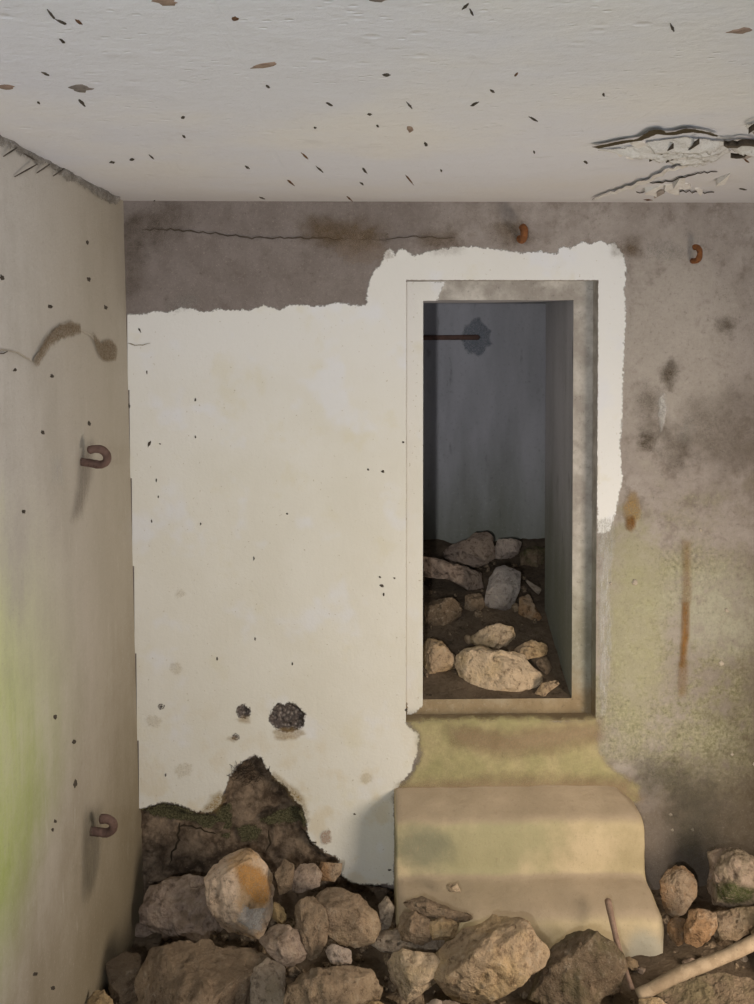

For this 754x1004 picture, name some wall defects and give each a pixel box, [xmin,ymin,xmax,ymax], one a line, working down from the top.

crack [144,228,452,241]
crack [0,326,148,363]
rust [681,604,689,666]
spalling [237,704,250,718]
spalling [268,703,305,738]
spalling [140,756,340,896]
spalling [312,876,394,899]